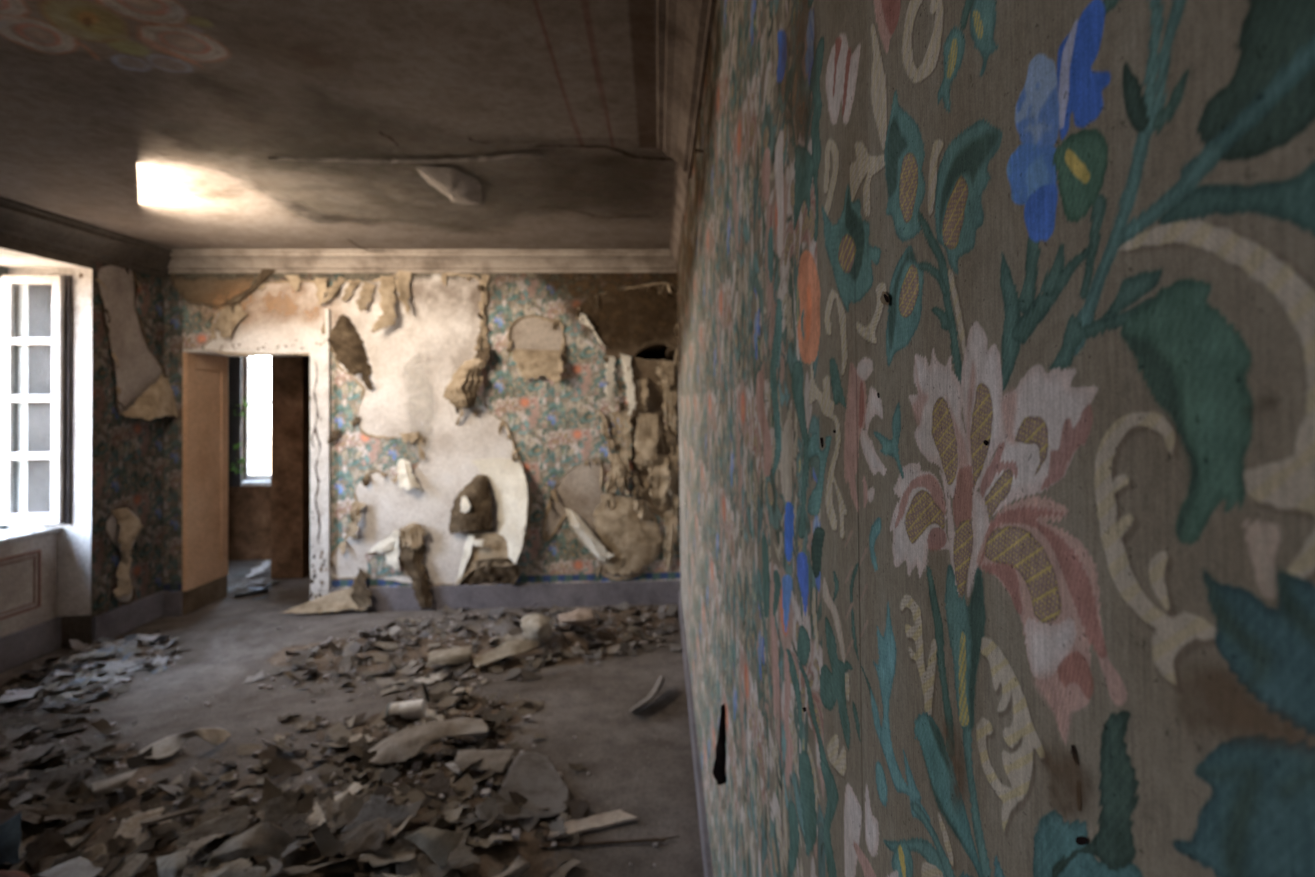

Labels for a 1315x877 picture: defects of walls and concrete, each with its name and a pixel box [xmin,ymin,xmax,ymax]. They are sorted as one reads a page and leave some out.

peeling [79,262,179,421]
peeling [171,269,680,600]